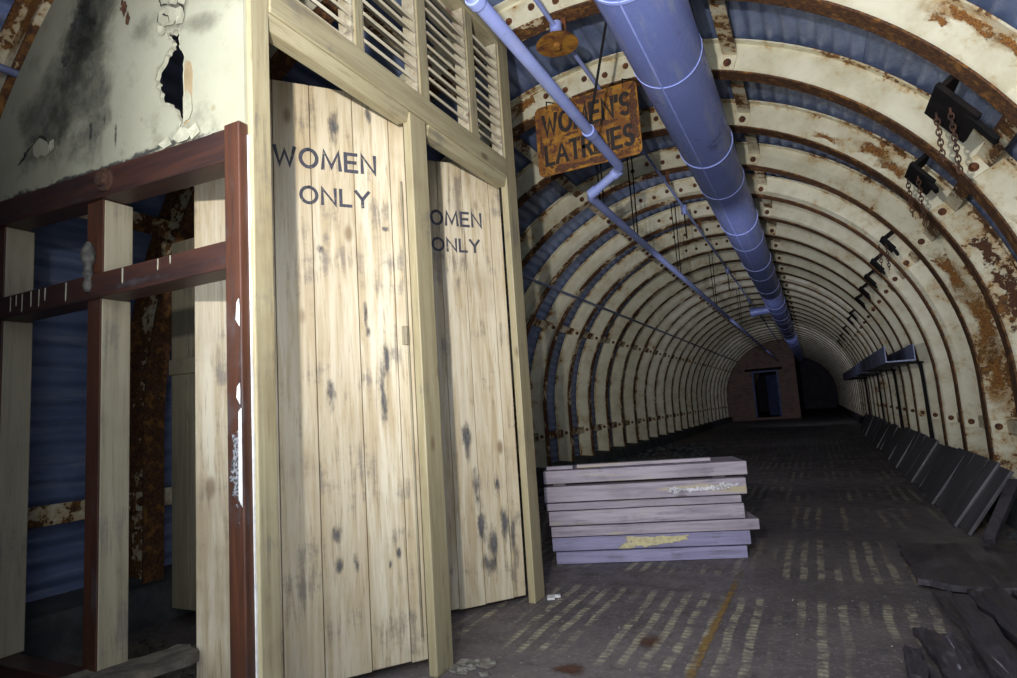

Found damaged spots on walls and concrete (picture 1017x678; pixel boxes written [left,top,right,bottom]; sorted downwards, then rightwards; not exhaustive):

corrosion [14,0,42,45]
leakage [20,0,115,160]
spalling [154,0,200,149]
corrosion [928,1,1017,56]
corrosion [930,254,1008,401]
corrosion [967,235,1017,334]